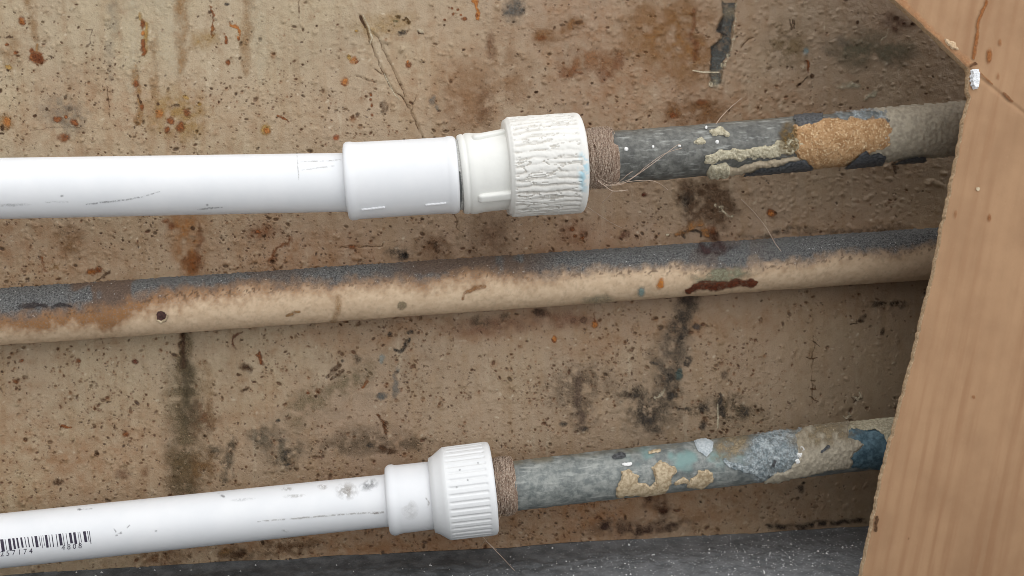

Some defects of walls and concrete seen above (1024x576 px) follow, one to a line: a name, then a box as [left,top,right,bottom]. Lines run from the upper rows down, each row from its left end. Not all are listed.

rust [5,35,45,71]
rust [132,13,148,125]
rust [157,96,201,132]
crack [359,15,423,138]
spalling [692,1,736,87]
water stain [171,333,236,494]
water stain [559,373,605,431]
water stain [621,296,749,431]